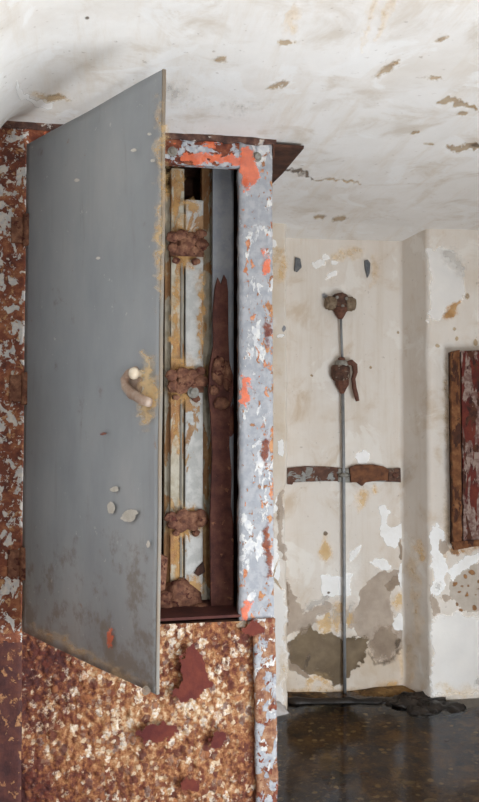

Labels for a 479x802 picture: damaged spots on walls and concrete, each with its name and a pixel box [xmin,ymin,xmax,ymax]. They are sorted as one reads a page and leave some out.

crack [285,168,361,185]
peeling [426,247,466,323]
flaking render [273,490,403,687]
peeling [429,523,479,697]